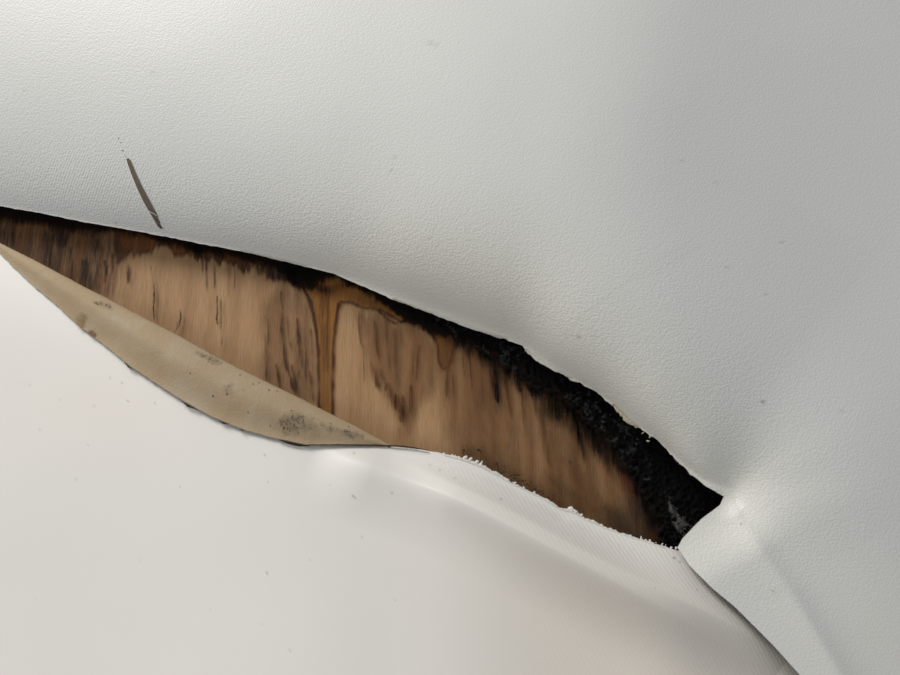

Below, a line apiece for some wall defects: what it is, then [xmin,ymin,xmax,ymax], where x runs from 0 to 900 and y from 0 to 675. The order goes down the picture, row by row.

peeling [0,243,426,450]
damp [0,206,723,550]